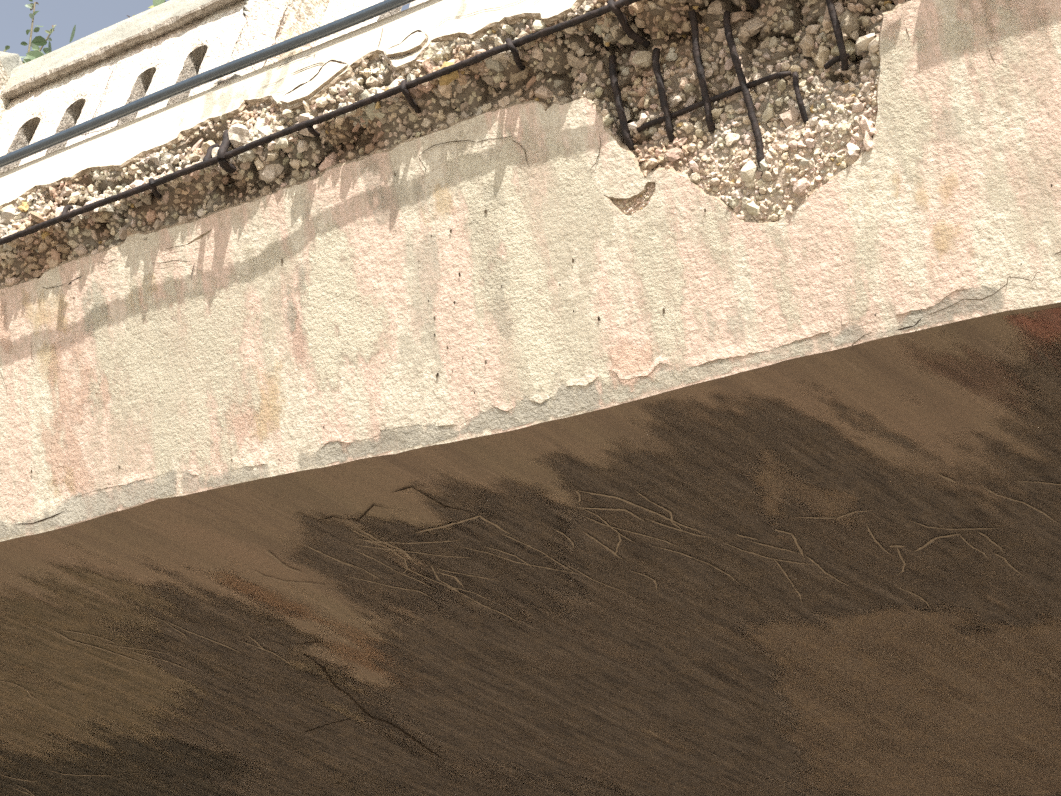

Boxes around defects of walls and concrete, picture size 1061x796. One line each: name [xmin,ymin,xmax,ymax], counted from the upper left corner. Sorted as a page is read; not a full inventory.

crack [263,49,348,104]
spalling [0,0,911,289]
crack [378,0,538,58]
damp [879,26,935,182]
damp [83,247,272,479]
damp [270,222,389,390]
damp [447,132,611,405]
damp [632,206,712,362]
damp [699,199,731,270]